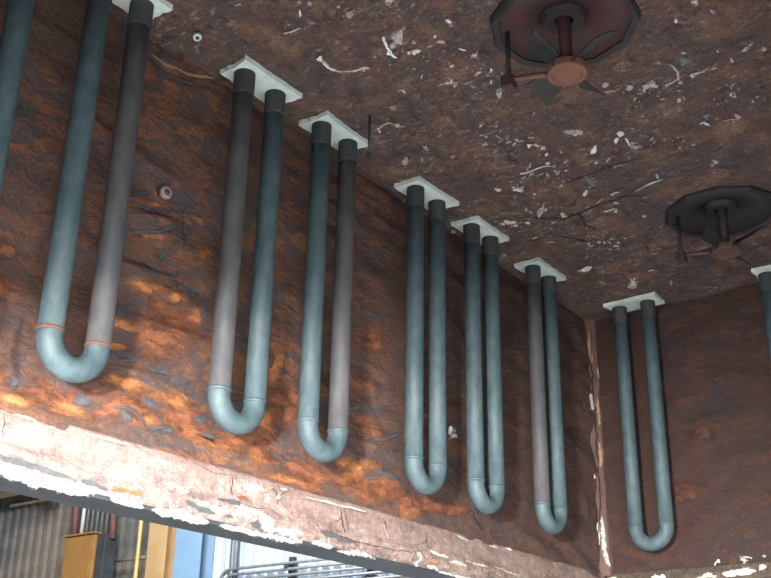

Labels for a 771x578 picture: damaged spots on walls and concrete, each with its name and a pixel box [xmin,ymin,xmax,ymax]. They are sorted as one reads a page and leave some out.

crack [590,335,602,555]
peeling [0,463,94,495]
peeling [111,496,143,508]
peeling [153,508,207,524]
peeling [195,480,301,543]
peeling [597,516,611,566]
peeling [698,555,766,578]